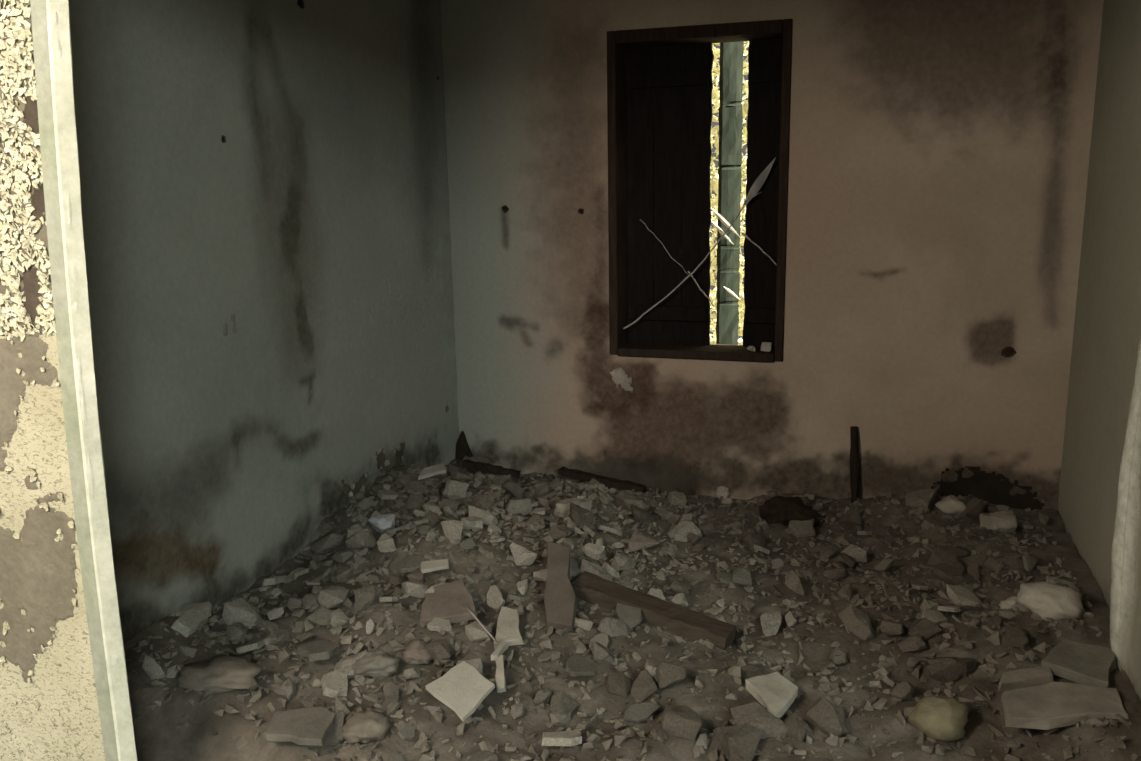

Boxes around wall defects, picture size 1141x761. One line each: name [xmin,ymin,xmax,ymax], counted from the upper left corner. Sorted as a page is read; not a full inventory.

peeling [0,0,78,683]
damp [202,489,350,605]
damp [120,607,167,642]